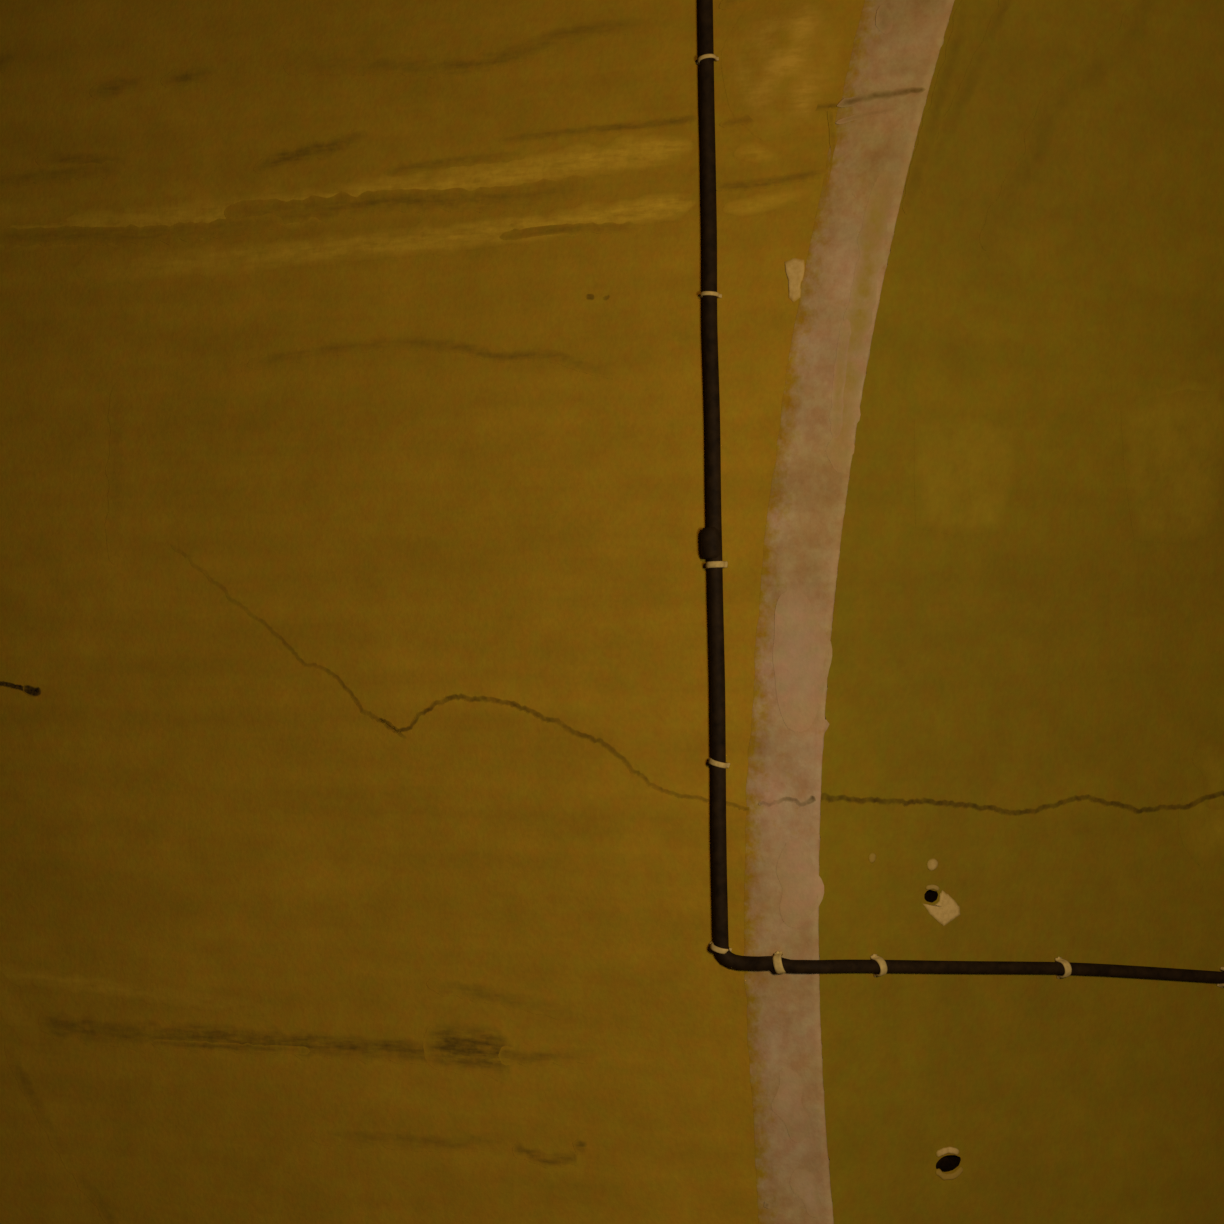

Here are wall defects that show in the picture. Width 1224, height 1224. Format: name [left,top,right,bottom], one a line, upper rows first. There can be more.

crack [0,681,41,697]
crack [171,544,1224,816]
flaking render [923,884,961,926]